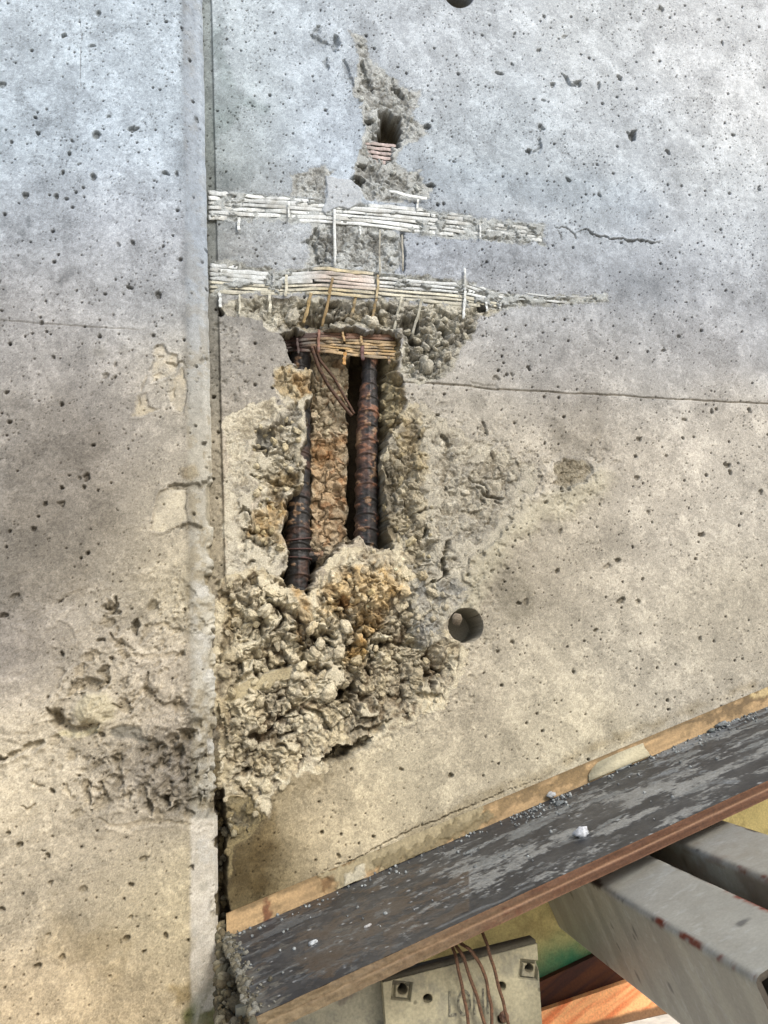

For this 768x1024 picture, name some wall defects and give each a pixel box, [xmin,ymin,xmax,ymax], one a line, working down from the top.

crack [550,223,662,247]
crack [405,379,768,406]
spalling [0,24,613,918]